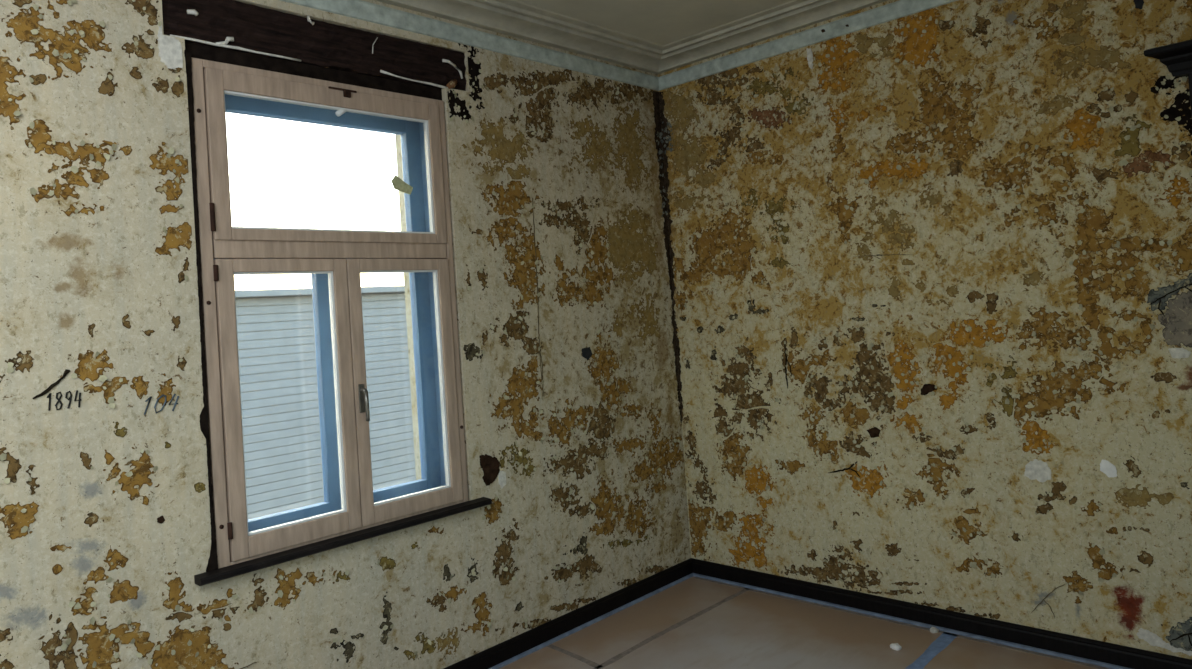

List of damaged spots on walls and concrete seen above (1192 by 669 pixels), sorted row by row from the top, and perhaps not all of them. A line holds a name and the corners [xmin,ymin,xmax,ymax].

peeling [0,0,218,575]
crack [653,91,683,423]
peeling [379,0,1192,660]
peeling [0,628,15,669]
peeling [36,545,350,669]
peeling [330,628,365,667]
peeling [375,556,396,571]